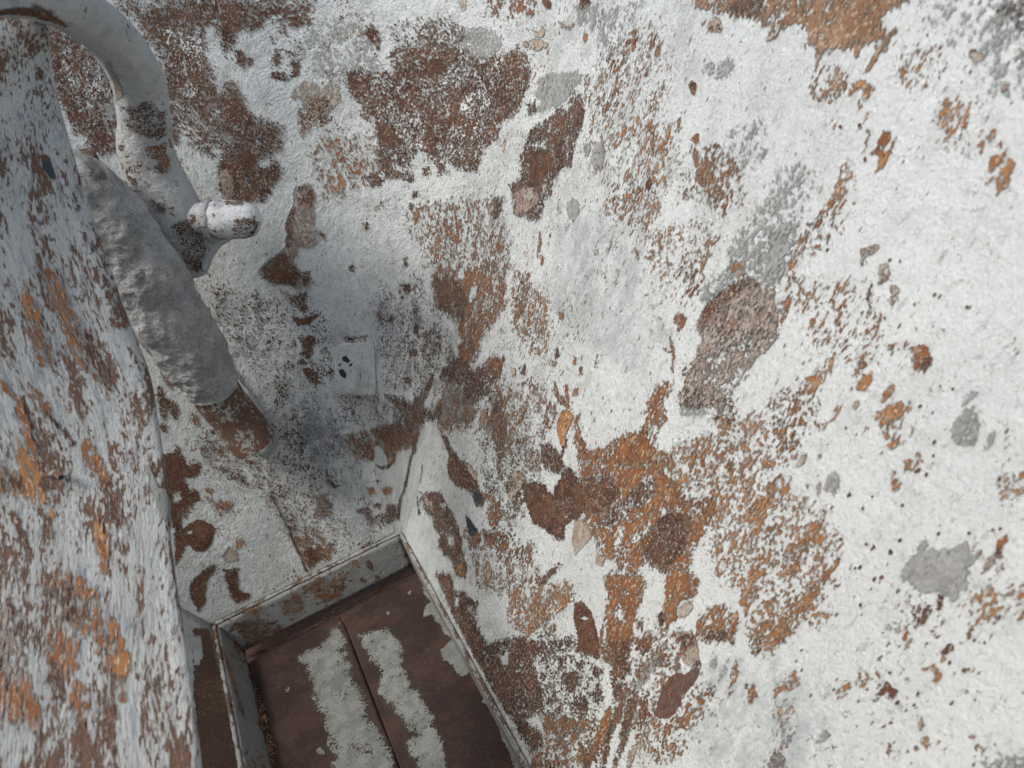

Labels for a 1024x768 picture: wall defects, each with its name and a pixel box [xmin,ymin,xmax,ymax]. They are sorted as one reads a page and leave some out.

spalling [455,25,504,60]
peeling [707,15,723,33]
spalling [532,69,583,119]
spalling [566,198,579,222]
peeling [677,157,823,414]
corrosion [144,0,934,768]
spalling [147,465,172,528]
spalling [816,471,851,497]
spalling [219,535,247,562]
peeling [465,515,481,544]
peeling [572,519,606,566]
peeling [654,629,729,719]